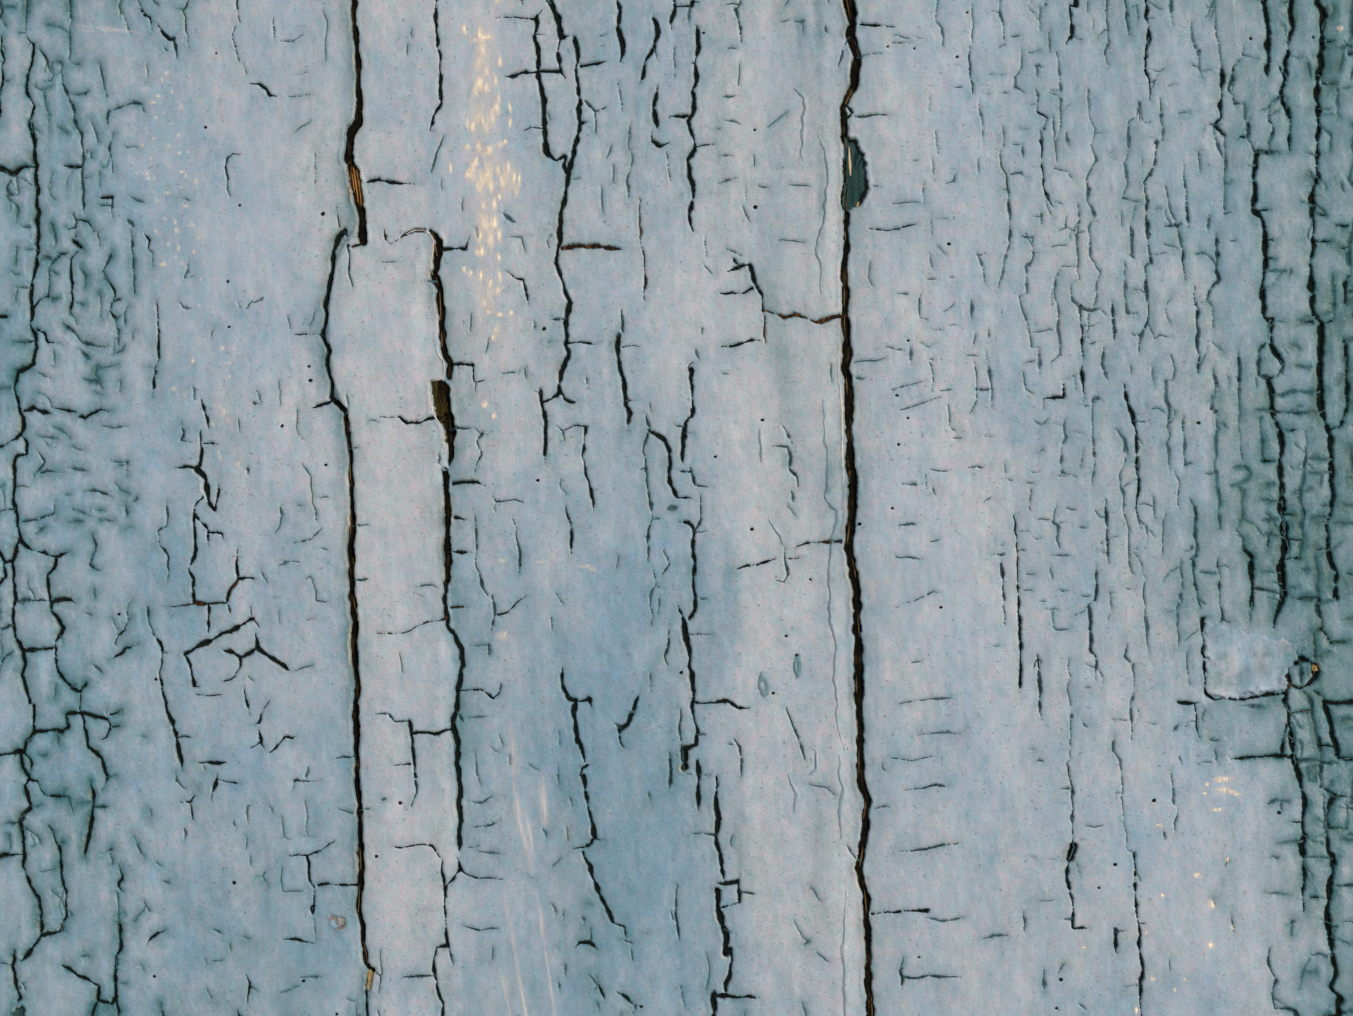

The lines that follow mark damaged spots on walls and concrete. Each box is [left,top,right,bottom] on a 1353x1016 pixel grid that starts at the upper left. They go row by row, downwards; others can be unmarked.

crack [0,0,759,1016]
peeling [842,137,868,211]
crack [640,0,1353,1016]
peeling [1202,620,1318,701]